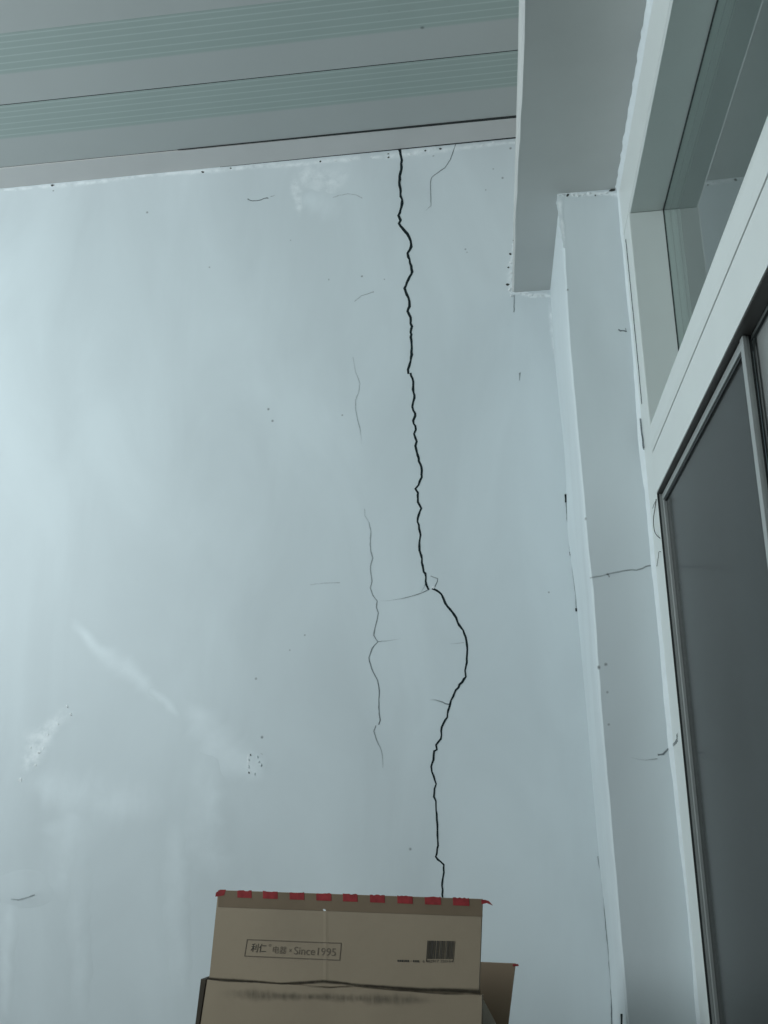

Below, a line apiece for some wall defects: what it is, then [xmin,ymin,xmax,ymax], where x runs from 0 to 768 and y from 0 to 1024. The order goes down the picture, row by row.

crack [369,599,381,730]
crack [397,150,468,898]